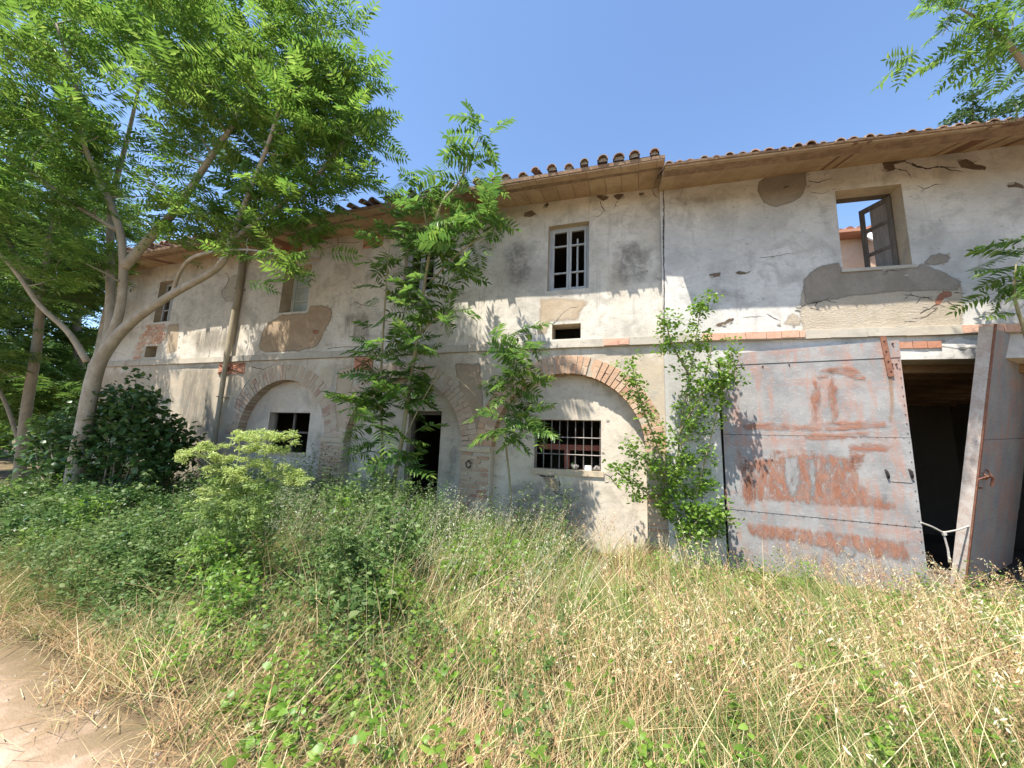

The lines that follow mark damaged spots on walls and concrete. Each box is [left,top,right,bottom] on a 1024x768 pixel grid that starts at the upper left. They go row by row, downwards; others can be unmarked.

crack [895,162,962,192]
flaking render [133,323,180,359]
flaking render [259,305,333,354]
flaking render [534,294,586,334]
flaking render [703,281,1022,341]
crack [883,270,964,322]